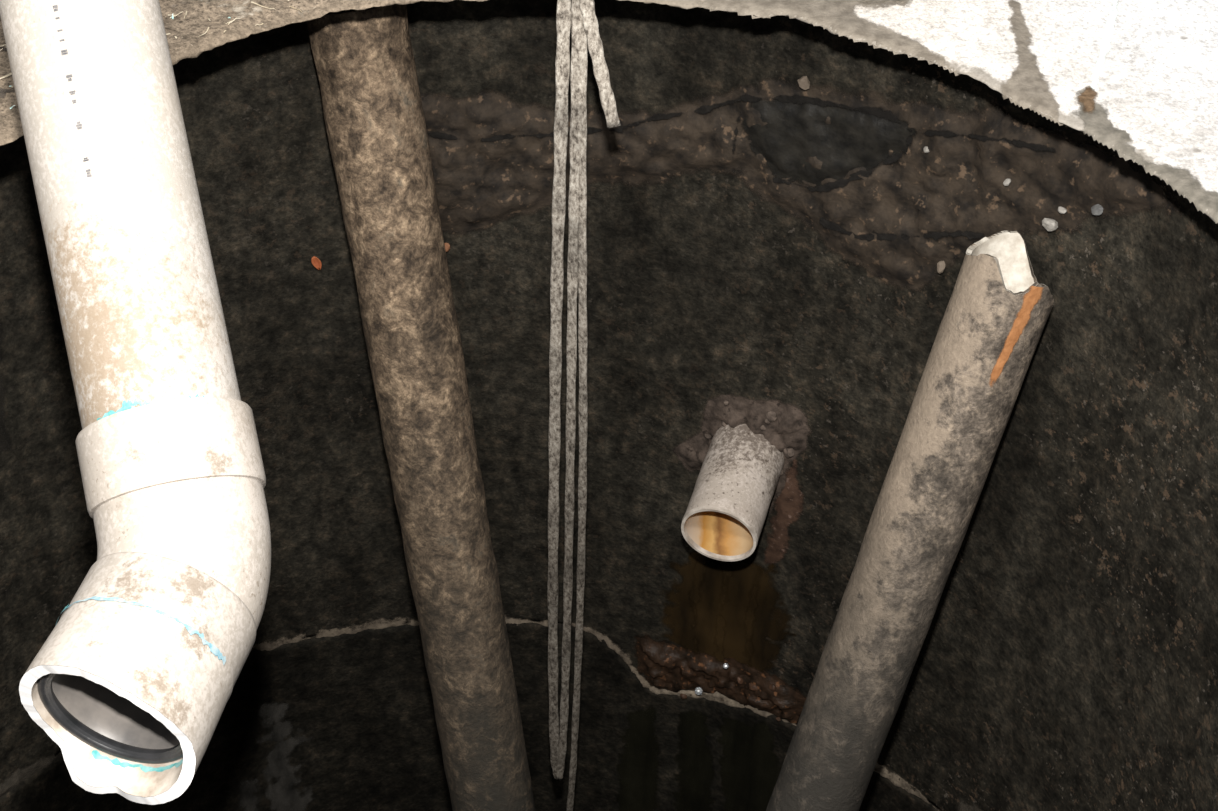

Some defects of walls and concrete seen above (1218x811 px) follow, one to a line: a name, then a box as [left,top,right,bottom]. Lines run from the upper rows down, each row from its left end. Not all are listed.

crack [428,94,1056,241]
leakage [1001,0,1062,126]
rust [1078,87,1097,112]
leakage [1073,0,1218,223]